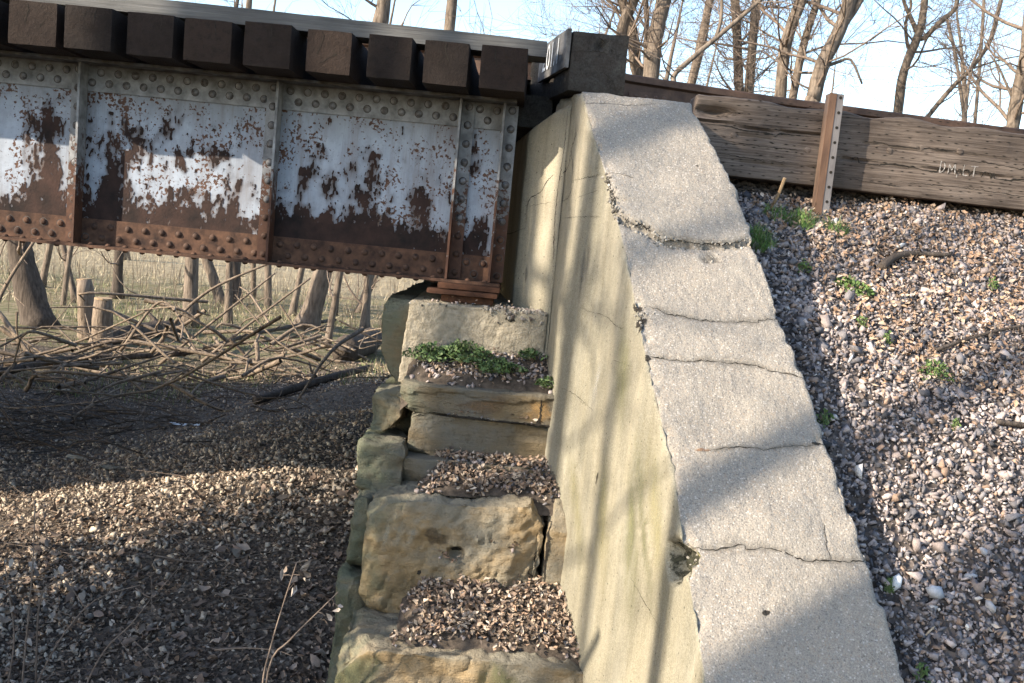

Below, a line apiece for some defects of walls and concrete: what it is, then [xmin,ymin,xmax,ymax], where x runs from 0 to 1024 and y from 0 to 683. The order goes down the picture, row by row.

peeling [82,100,260,235]
crack [507,102,744,257]
spalling [601,173,748,264]
crack [653,308,776,323]
crack [614,355,802,378]
crack [708,444,813,452]
crack [696,525,865,562]